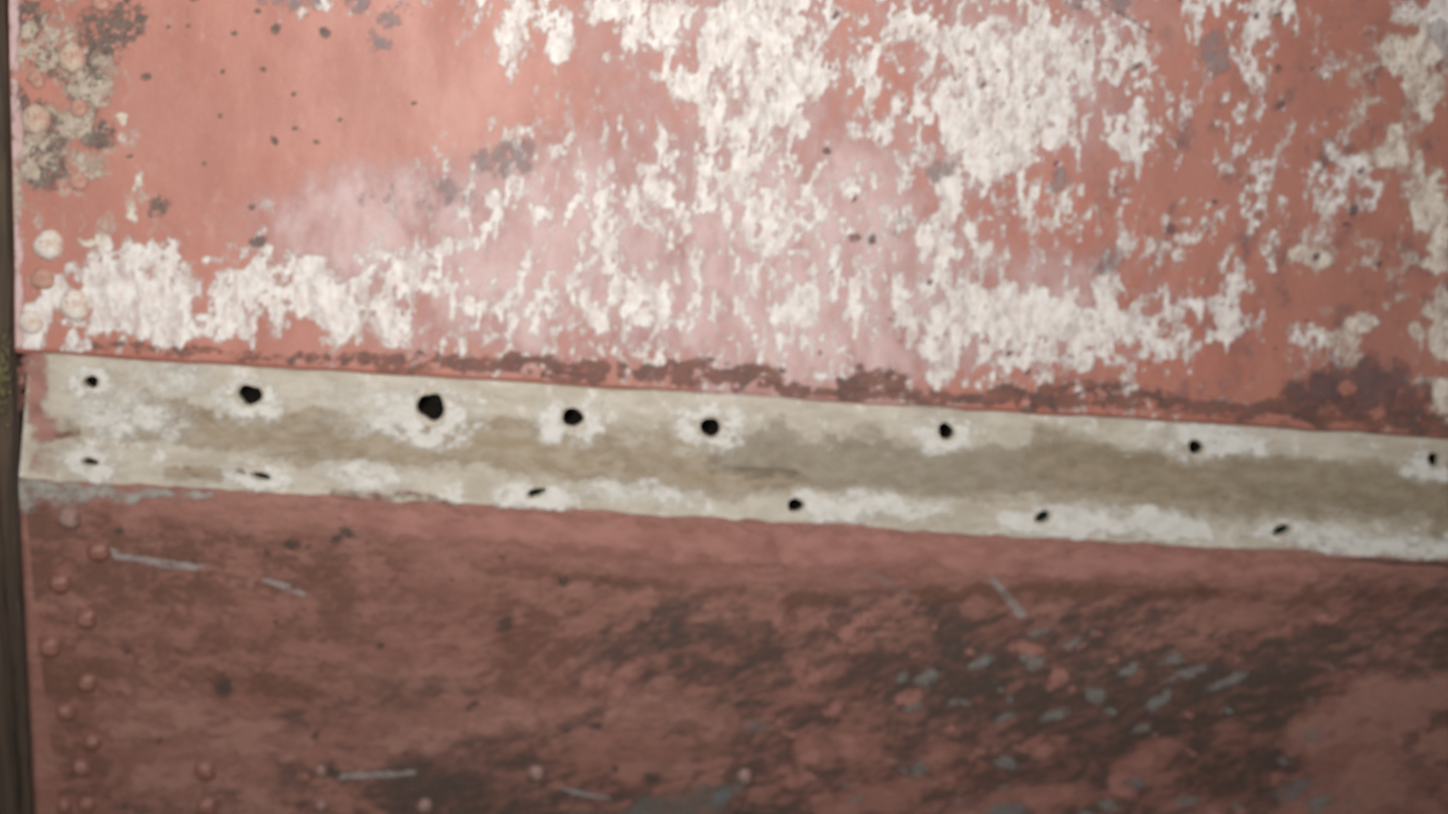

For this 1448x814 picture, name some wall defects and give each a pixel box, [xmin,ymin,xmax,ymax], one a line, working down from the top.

rust [13,0,115,225]
leakage [676,0,778,120]
leakage [941,0,1020,74]
leakage [1028,0,1119,106]
rust [92,341,155,353]
leakage [275,115,987,404]
peeling [9,0,1448,441]
rust [237,350,1448,438]
leakage [1019,254,1092,354]
rust [869,580,1217,604]